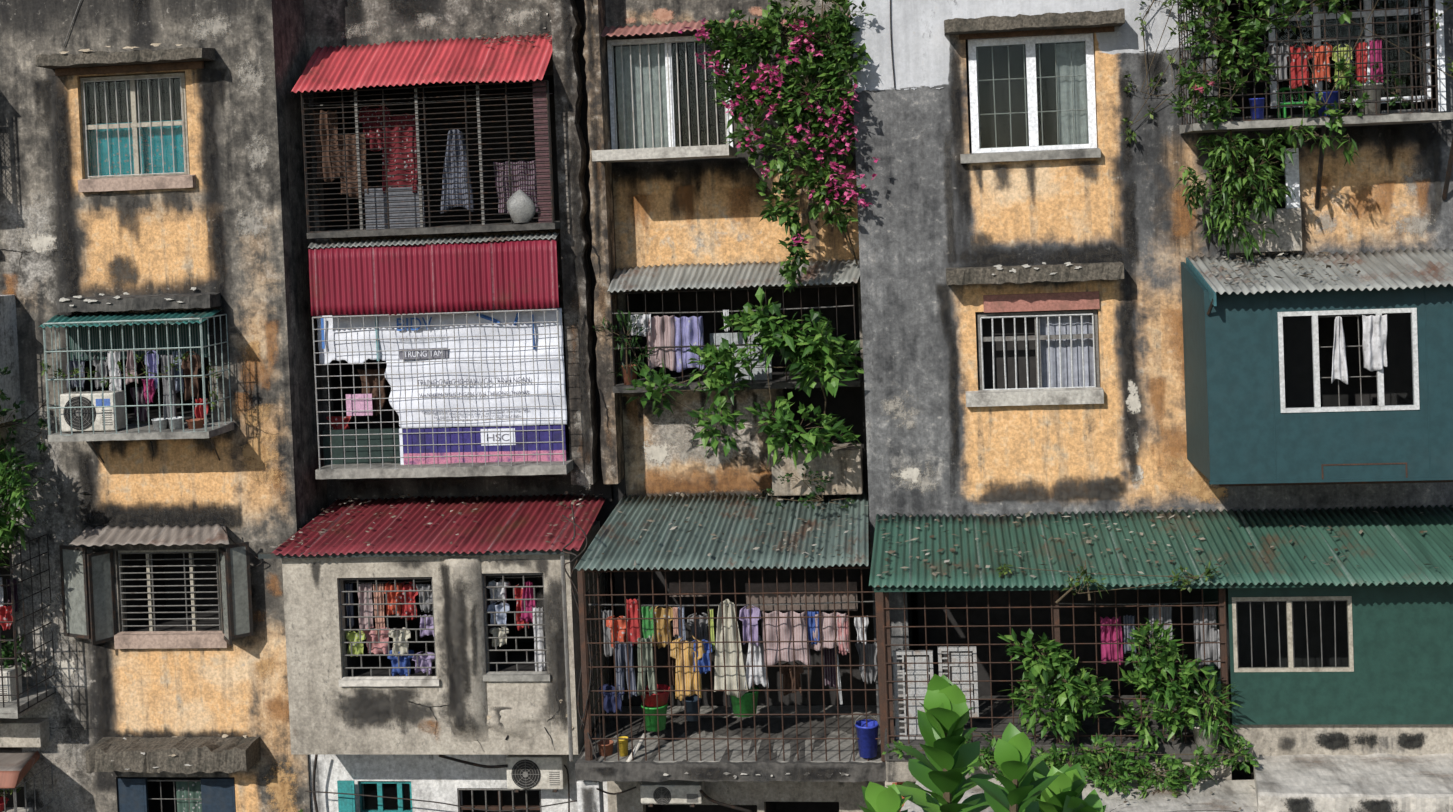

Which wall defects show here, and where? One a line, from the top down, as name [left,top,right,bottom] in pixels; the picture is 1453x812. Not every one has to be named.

leakage [91,194,138,238]
leakage [108,256,138,285]
leakage [162,191,183,212]
crack [565,0,614,501]
leakage [657,161,774,198]
leakage [944,56,1139,268]
leakage [1119,54,1163,167]
leakage [936,284,959,464]
leakage [980,301,1137,501]
rust [646,471,769,492]
leakage [312,563,320,584]
leakage [340,565,477,732]